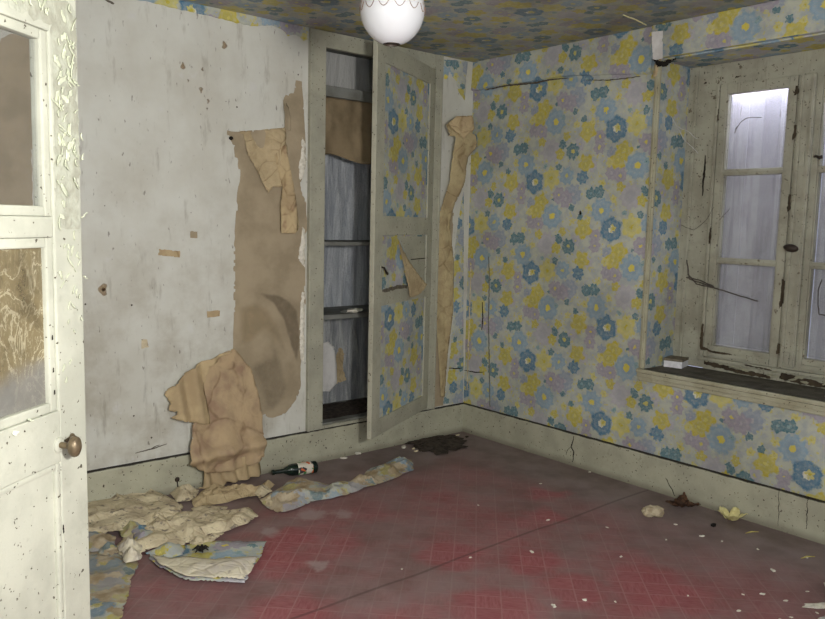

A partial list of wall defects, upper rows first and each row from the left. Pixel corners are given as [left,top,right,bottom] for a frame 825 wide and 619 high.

peeling [0,0,88,288]
peeling [227,80,307,418]
peeling [700,323,825,388]